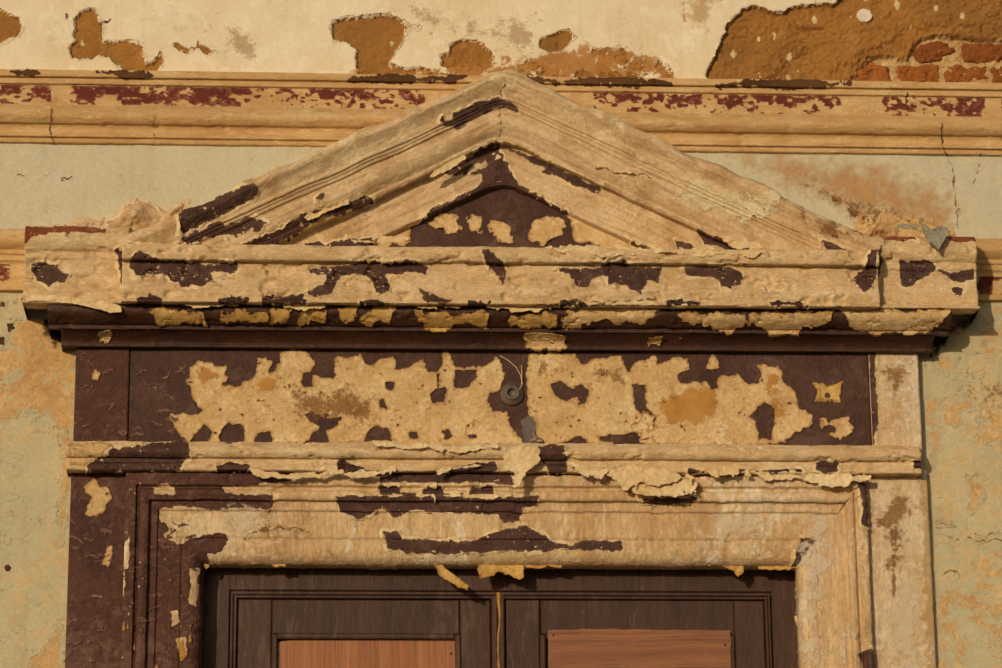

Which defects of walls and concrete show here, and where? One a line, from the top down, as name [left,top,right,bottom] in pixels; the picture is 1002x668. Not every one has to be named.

spalling [0,8,26,47]
spalling [514,0,1002,117]
peeling [436,95,521,130]
peeling [927,352,961,378]
peeling [909,394,1002,471]
peeling [933,536,1002,668]